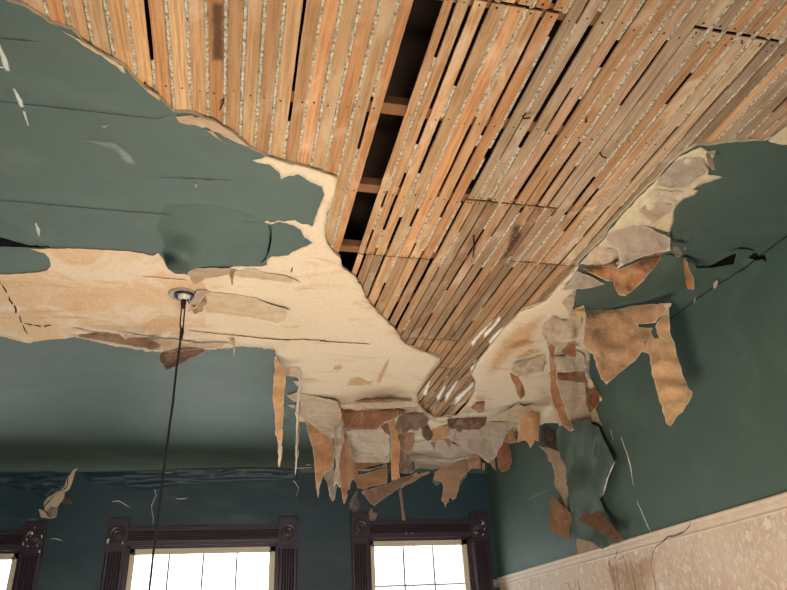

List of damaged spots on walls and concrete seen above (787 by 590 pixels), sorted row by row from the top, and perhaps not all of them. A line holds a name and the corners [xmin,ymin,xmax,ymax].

flaking render [768,126,787,145]
flaking render [598,147,723,249]
crack [0,282,52,334]
flaking render [0,157,594,462]
crack [674,236,787,316]
flaking render [39,468,78,519]